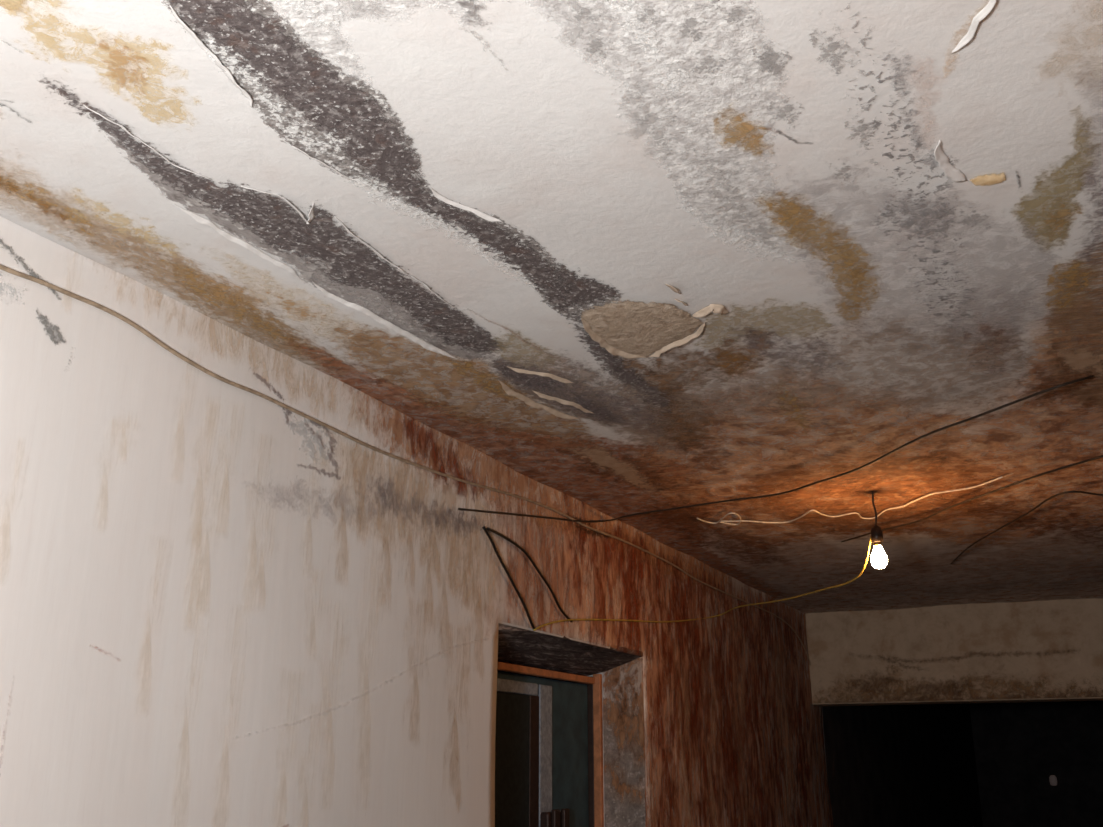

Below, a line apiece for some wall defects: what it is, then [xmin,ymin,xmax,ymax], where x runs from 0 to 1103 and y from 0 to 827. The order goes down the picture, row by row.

damp [0,0,187,123]
damp [265,0,482,82]
peeling [951,0,997,54]
flaking render [37,0,729,427]
damp [532,0,880,320]
damp [673,8,1029,422]
crack [250,367,341,480]
damp [484,328,669,439]
rust [0,176,1103,827]